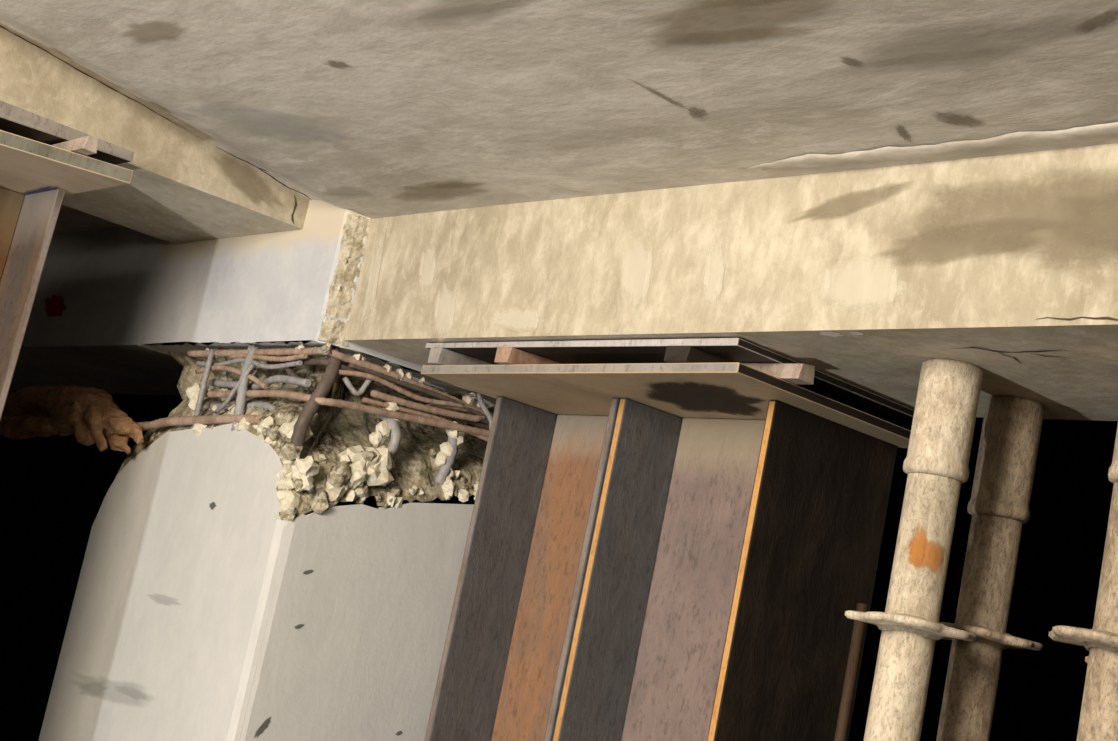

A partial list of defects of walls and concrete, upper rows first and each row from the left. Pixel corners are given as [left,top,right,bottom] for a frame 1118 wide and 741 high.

crack [1039,315,1118,323]
spalling [114,214,495,521]
crack [950,347,1066,364]
rust [910,531,943,571]